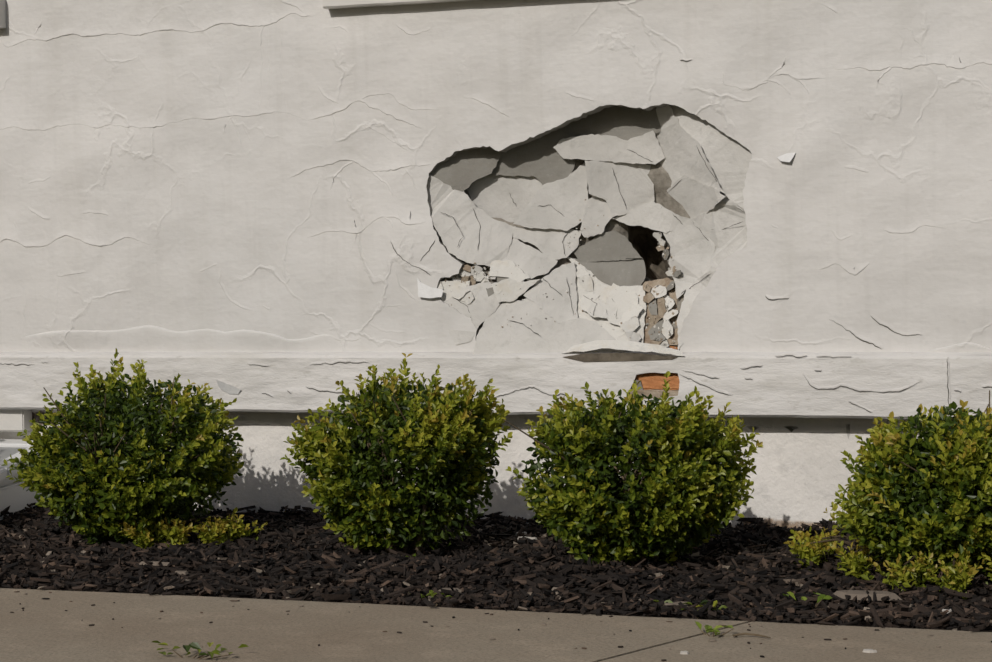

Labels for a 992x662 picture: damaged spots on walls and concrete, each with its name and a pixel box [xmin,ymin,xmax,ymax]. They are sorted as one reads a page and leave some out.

crack [2,0,349,48]
crack [722,52,992,100]
crack [287,147,435,276]
flaking render [417,105,752,362]
crack [765,293,790,301]
crack [0,359,48,367]
crack [261,359,370,397]
crack [488,385,618,403]
flaking render [629,373,680,399]
crack [679,314,923,412]
crack [947,357,992,416]